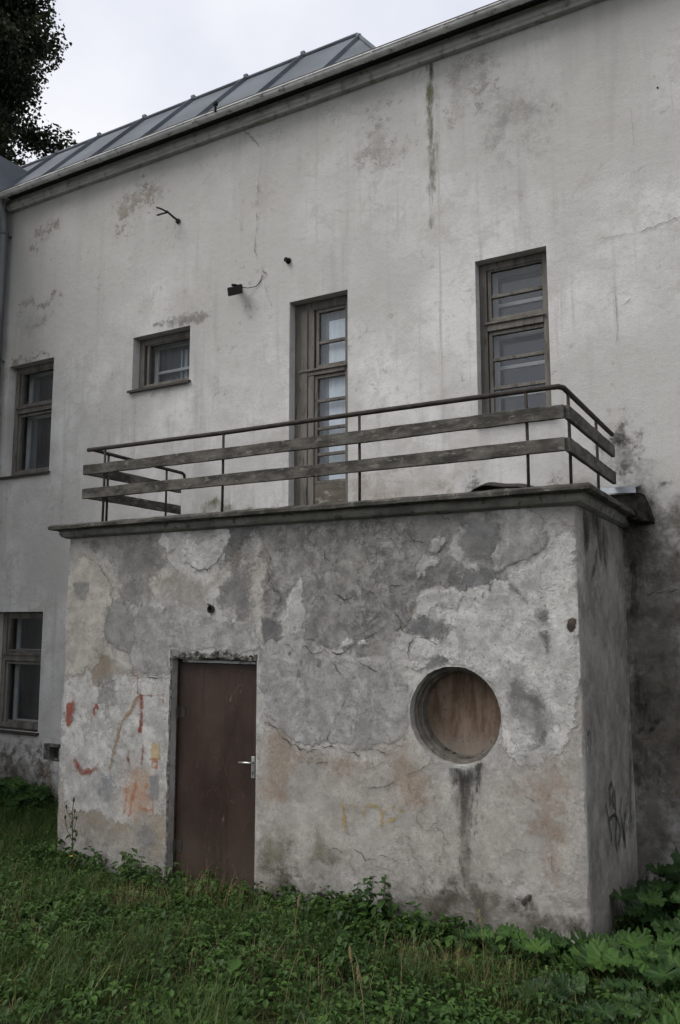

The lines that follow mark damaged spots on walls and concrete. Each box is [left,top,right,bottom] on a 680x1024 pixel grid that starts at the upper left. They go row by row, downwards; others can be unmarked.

mould [611,423,631,445]
flaking render [260,516,491,657]
crack [336,514,451,616]
crack [265,613,454,872]
damp [455,763,480,820]
damp [582,507,680,882]